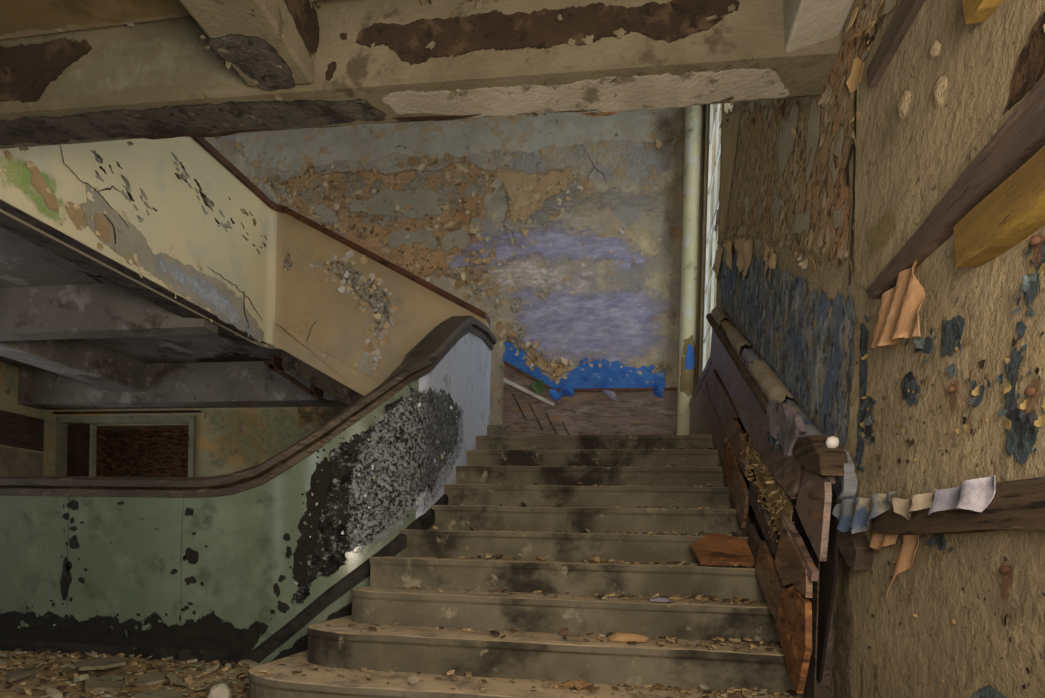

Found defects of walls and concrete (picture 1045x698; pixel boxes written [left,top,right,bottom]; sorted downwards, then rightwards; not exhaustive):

crack [60,145,128,244]
spalling [0,0,1045,504]
peeling [52,500,89,605]
peeling [170,545,208,586]
peeling [282,533,292,558]
damp [0,600,272,652]
peeling [270,575,290,614]
damp [322,602,352,622]
damp [270,634,308,662]
peeling [971,685,1007,698]